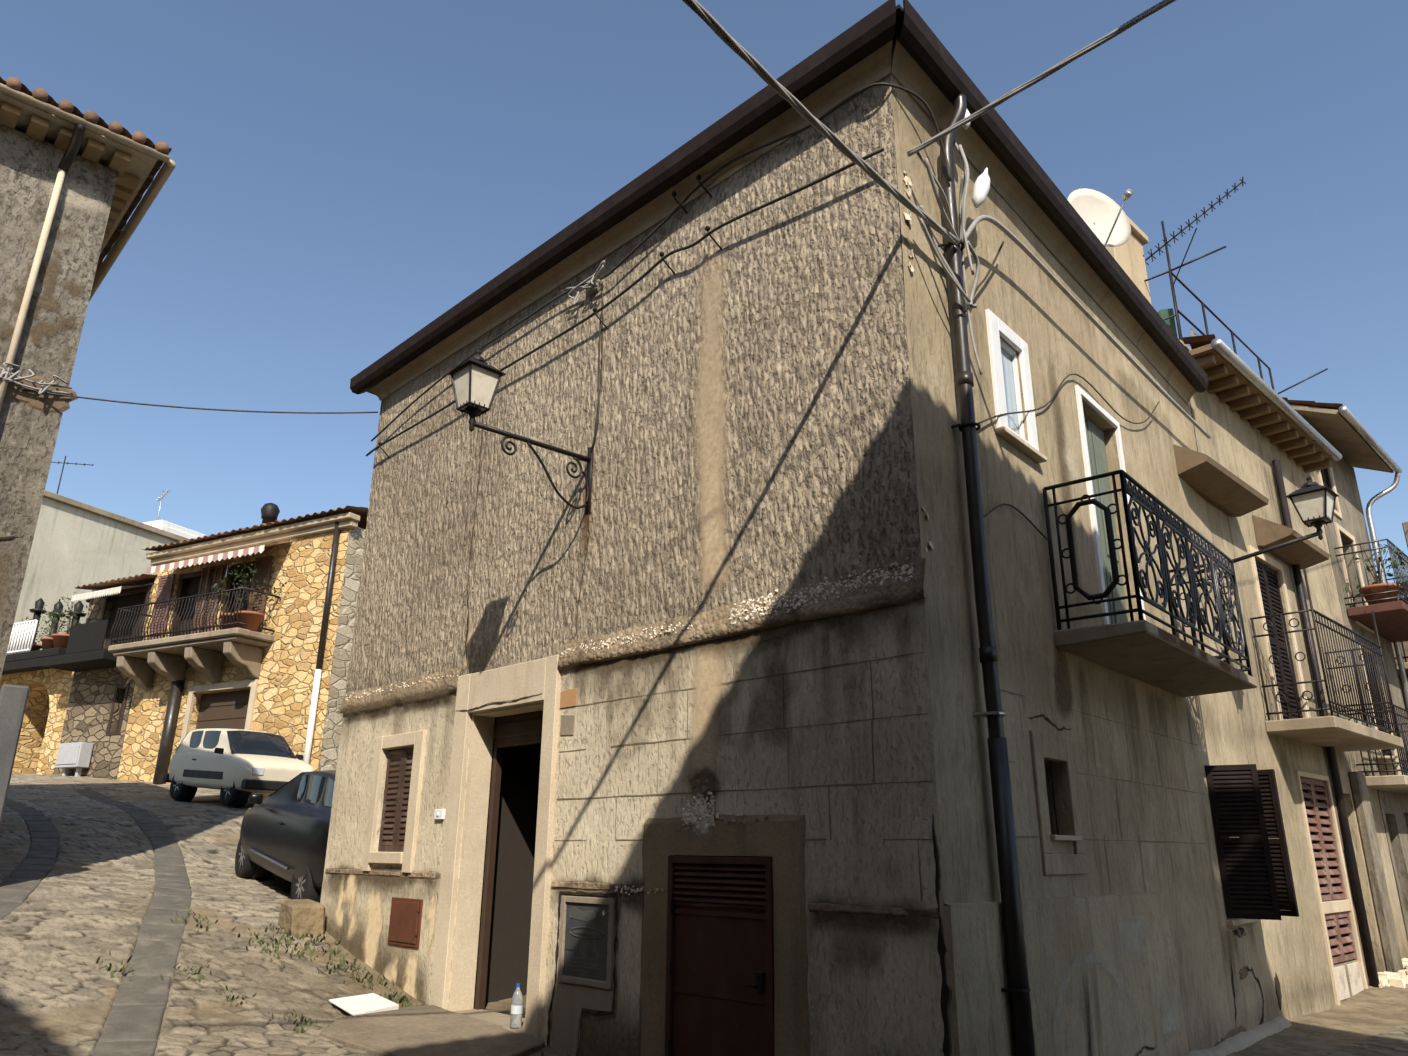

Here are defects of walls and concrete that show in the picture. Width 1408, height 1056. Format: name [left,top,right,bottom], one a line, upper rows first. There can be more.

leakage [697,276,727,584]
leakage [347,692,453,718]
leakage [573,604,898,780]
spalling [681,767,768,834]